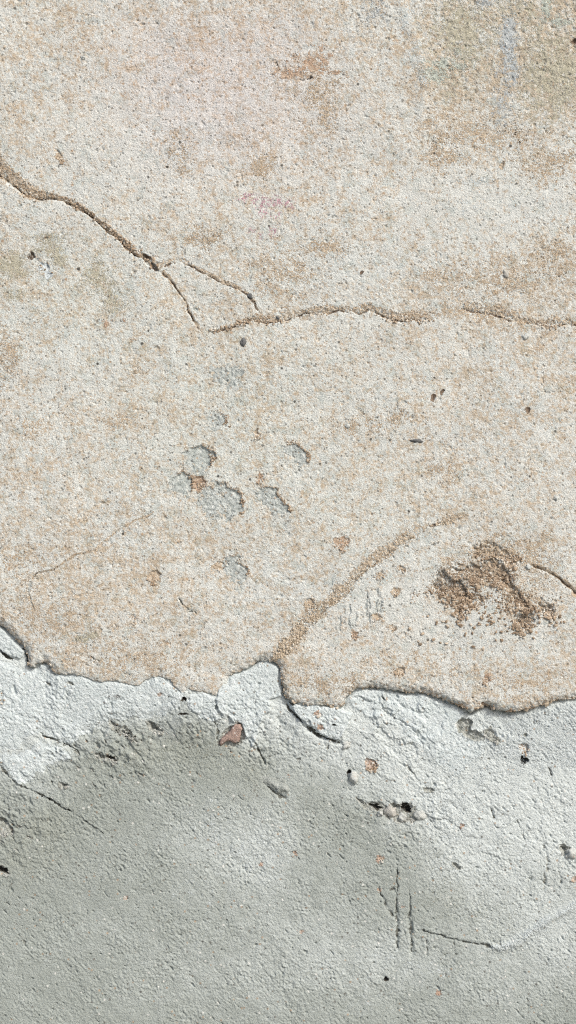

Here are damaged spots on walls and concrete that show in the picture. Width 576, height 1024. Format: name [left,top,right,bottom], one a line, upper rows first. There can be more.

crack [0,150,576,334]
spalling [167,444,292,523]
spalling [282,439,313,467]
spalling [370,520,576,650]
peeling [0,626,576,790]
spalling [0,807,31,852]
spalling [355,797,418,824]